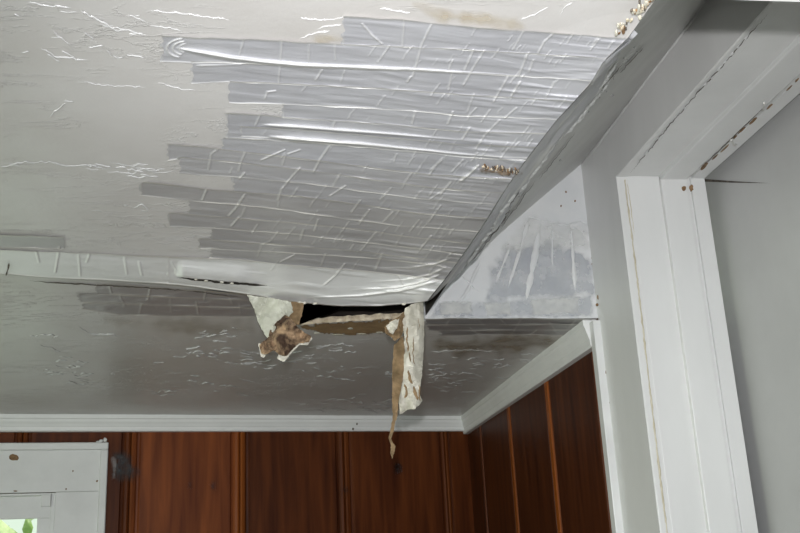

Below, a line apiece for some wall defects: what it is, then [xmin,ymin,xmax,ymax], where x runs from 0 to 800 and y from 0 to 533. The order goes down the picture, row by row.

crack [637,18,765,165]
crack [704,110,761,183]
peeling [173,295,368,381]
peeling [318,271,535,458]